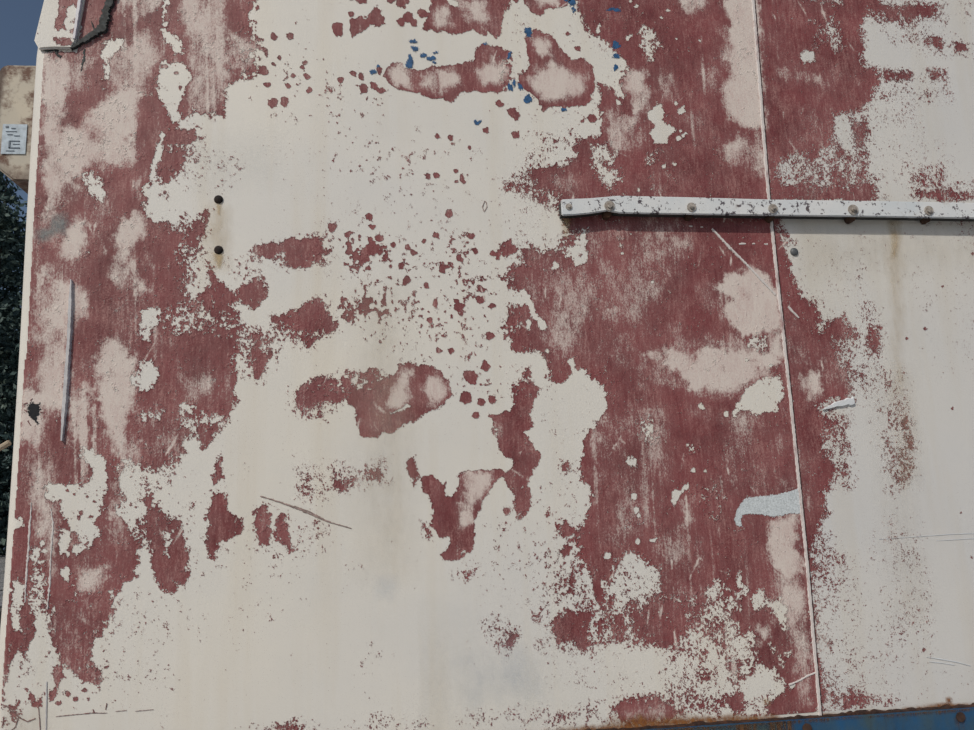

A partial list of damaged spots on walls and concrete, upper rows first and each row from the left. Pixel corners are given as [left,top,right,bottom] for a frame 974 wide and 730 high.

peeling [332,0,385,38]
peeling [268,96,289,116]
peeling [319,70,351,134]
peeling [364,126,455,186]
peeling [893,122,974,203]
peeling [424,169,481,209]
peeling [203,453,244,567]
peeling [246,455,395,577]
peeling [481,606,522,657]
peeling [249,716,328,730]
corrosion [568,698,974,730]